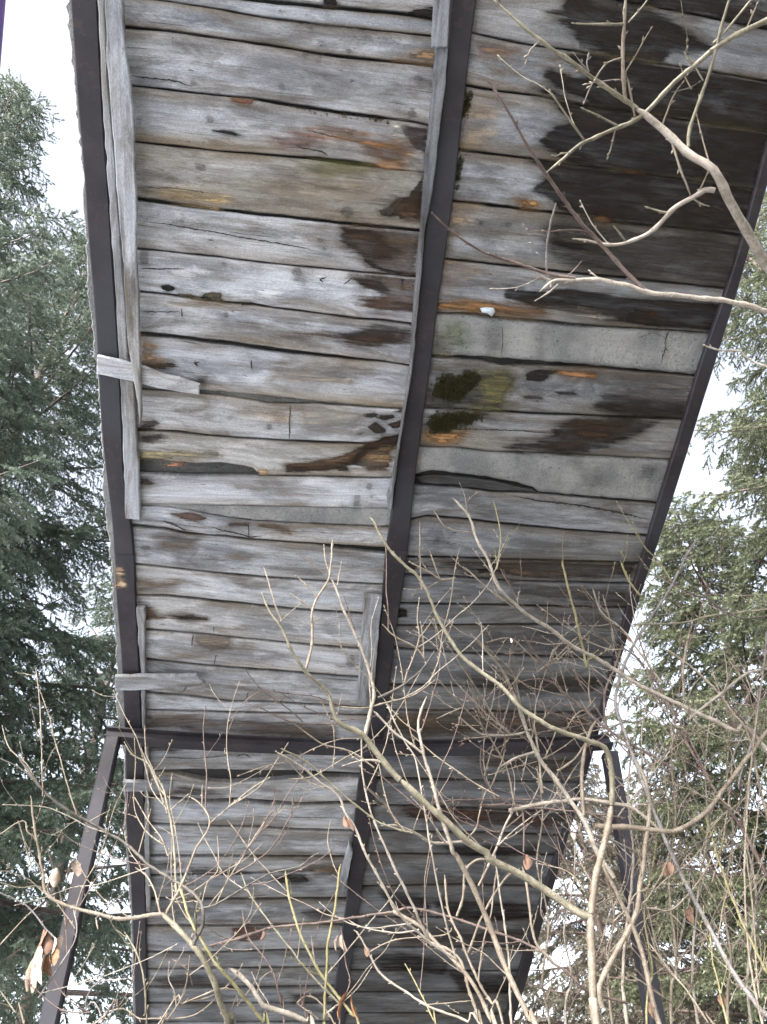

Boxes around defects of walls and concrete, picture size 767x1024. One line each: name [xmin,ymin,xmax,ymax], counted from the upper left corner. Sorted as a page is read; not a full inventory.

water stain [530,0,767,285]
water stain [341,227,419,312]
water stain [285,434,399,472]
water stain [502,377,690,454]